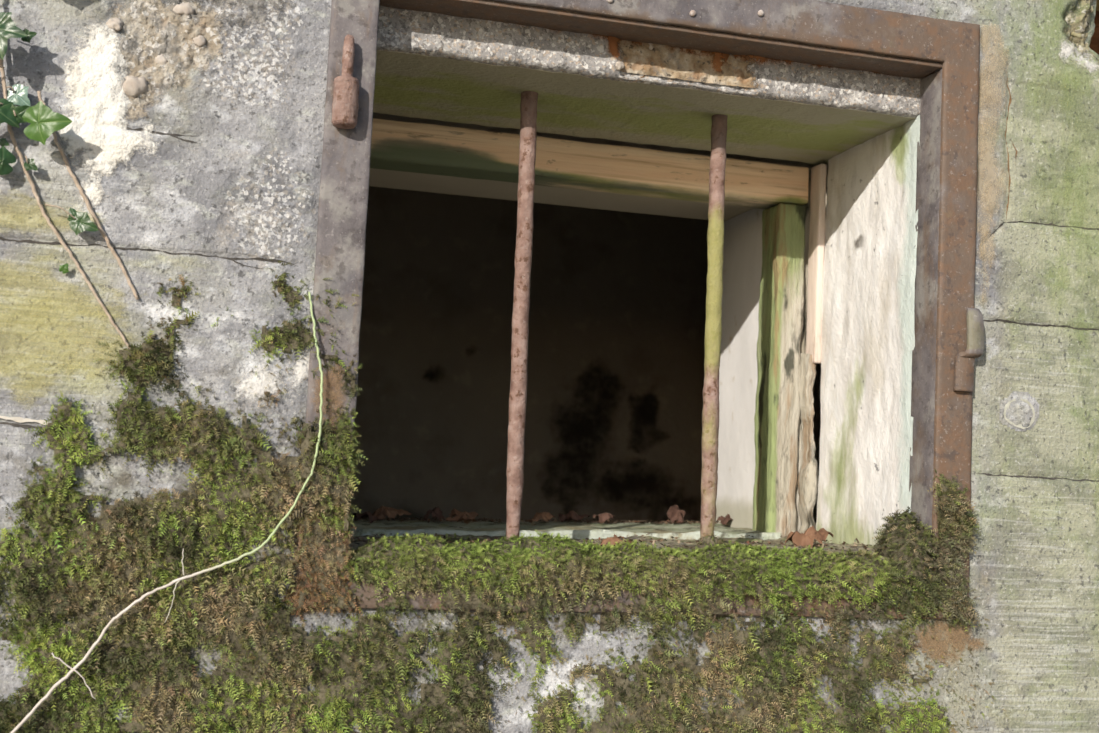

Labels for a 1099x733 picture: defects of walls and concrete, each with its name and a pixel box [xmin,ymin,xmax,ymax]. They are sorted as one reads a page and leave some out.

corrosion [595,34,641,57]
peeling [59,0,285,205]
crack [126,127,201,144]
crack [0,237,297,269]
leakage [542,366,697,521]